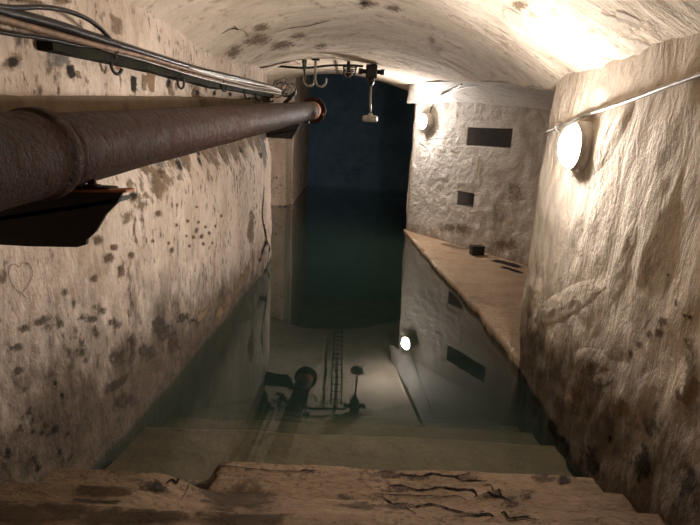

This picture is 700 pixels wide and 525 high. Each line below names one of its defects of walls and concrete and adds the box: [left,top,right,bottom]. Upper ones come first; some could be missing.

crack [258,186,270,272]
water stain [19,314,64,333]
water stain [78,305,121,337]
water stain [110,336,159,367]
water stain [681,337,699,419]
water stain [630,443,652,483]
crack [338,470,536,520]